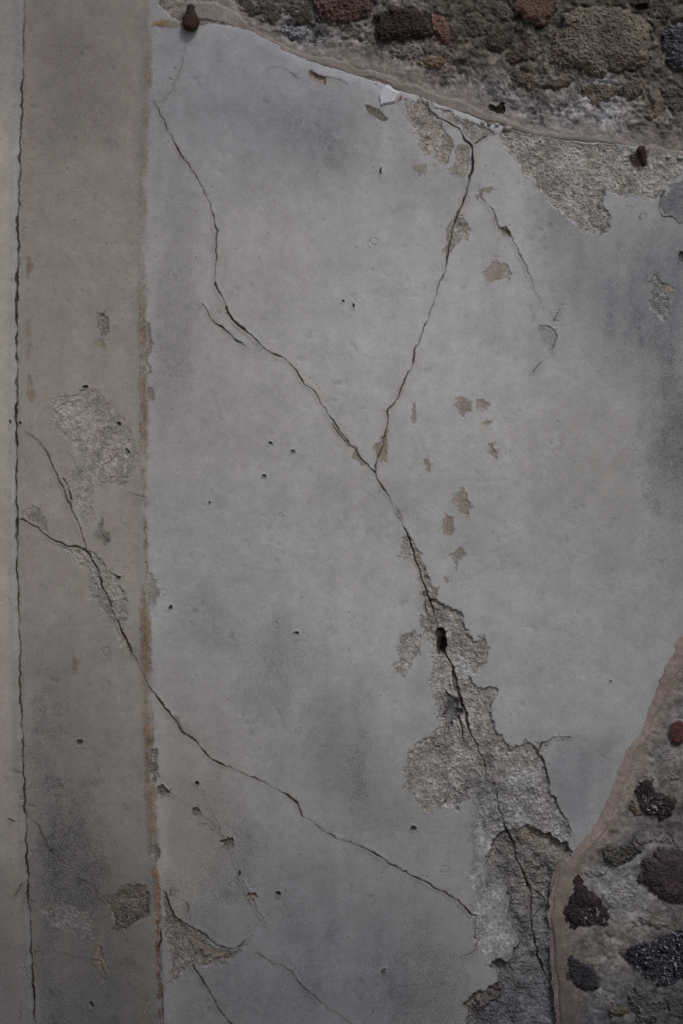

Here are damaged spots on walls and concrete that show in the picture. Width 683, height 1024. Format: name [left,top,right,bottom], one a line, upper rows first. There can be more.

spalling [366,85,683,235]
crack [13,217,21,358]
crack [207,306,247,343]
crack [333,107,485,491]
peeling [442,208,469,256]
crack [15,402,73,512]
peeling [442,487,472,535]
crack [16,519,138,662]
crack [442,639,487,774]
spalling [392,535,573,1024]
spalling [96,885,151,932]
spalling [162,896,241,981]